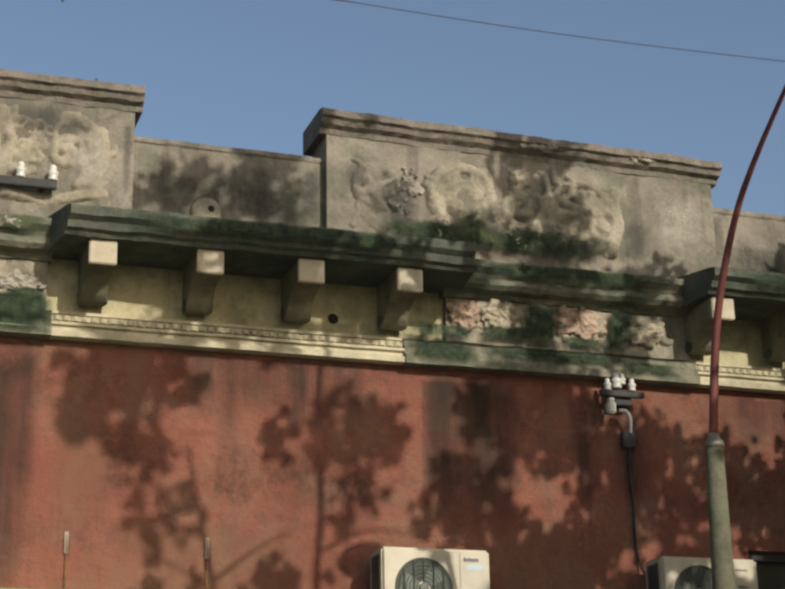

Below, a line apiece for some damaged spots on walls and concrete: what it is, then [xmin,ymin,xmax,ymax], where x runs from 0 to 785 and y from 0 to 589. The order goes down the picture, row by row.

spalling [446,299,523,332]
spalling [553,305,607,340]